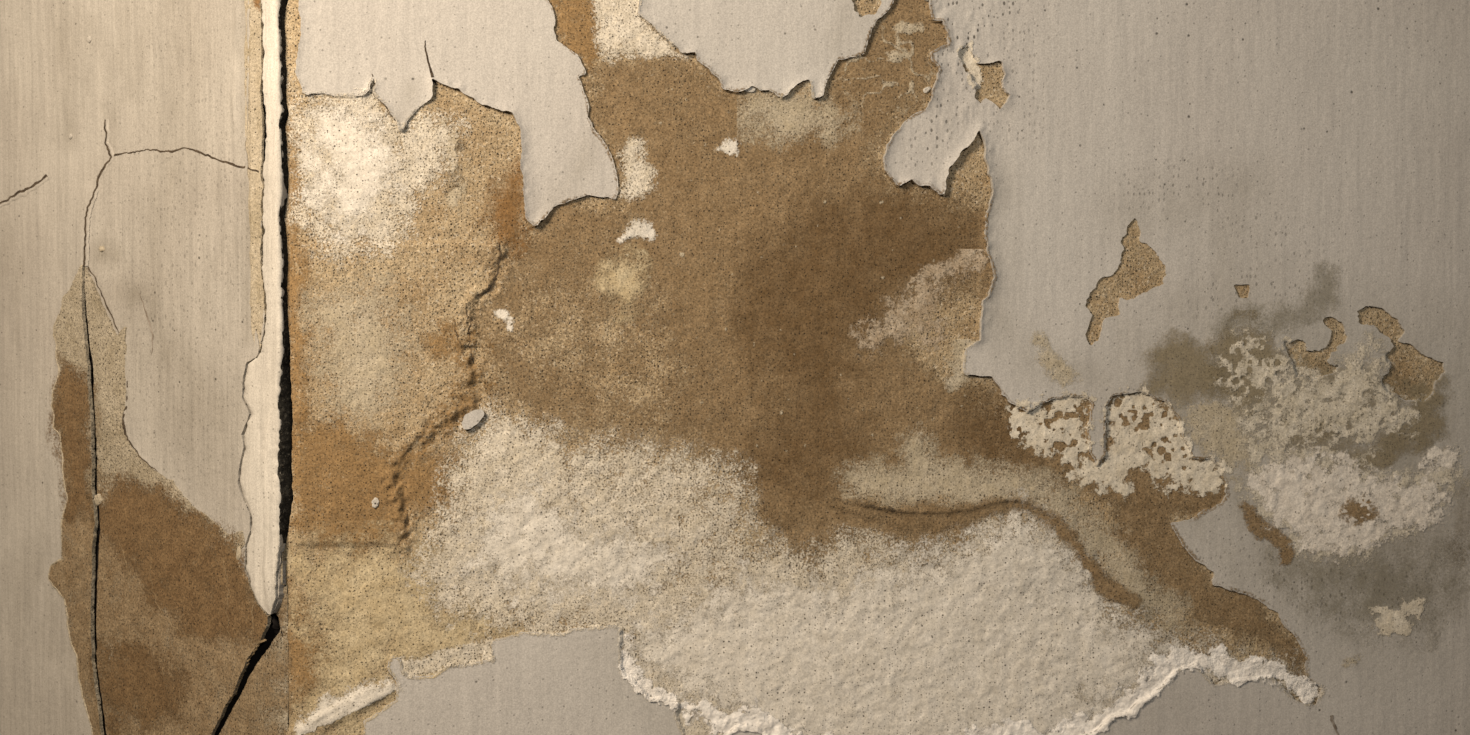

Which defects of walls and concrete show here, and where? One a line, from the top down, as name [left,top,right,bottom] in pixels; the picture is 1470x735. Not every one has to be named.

crack [0,174,49,208]
crack [83,24,267,735]
damp [219,0,1325,735]
peeling [240,0,1321,735]
damp [1148,325,1470,567]
crack [212,613,282,735]
crack [1330,715,1339,735]